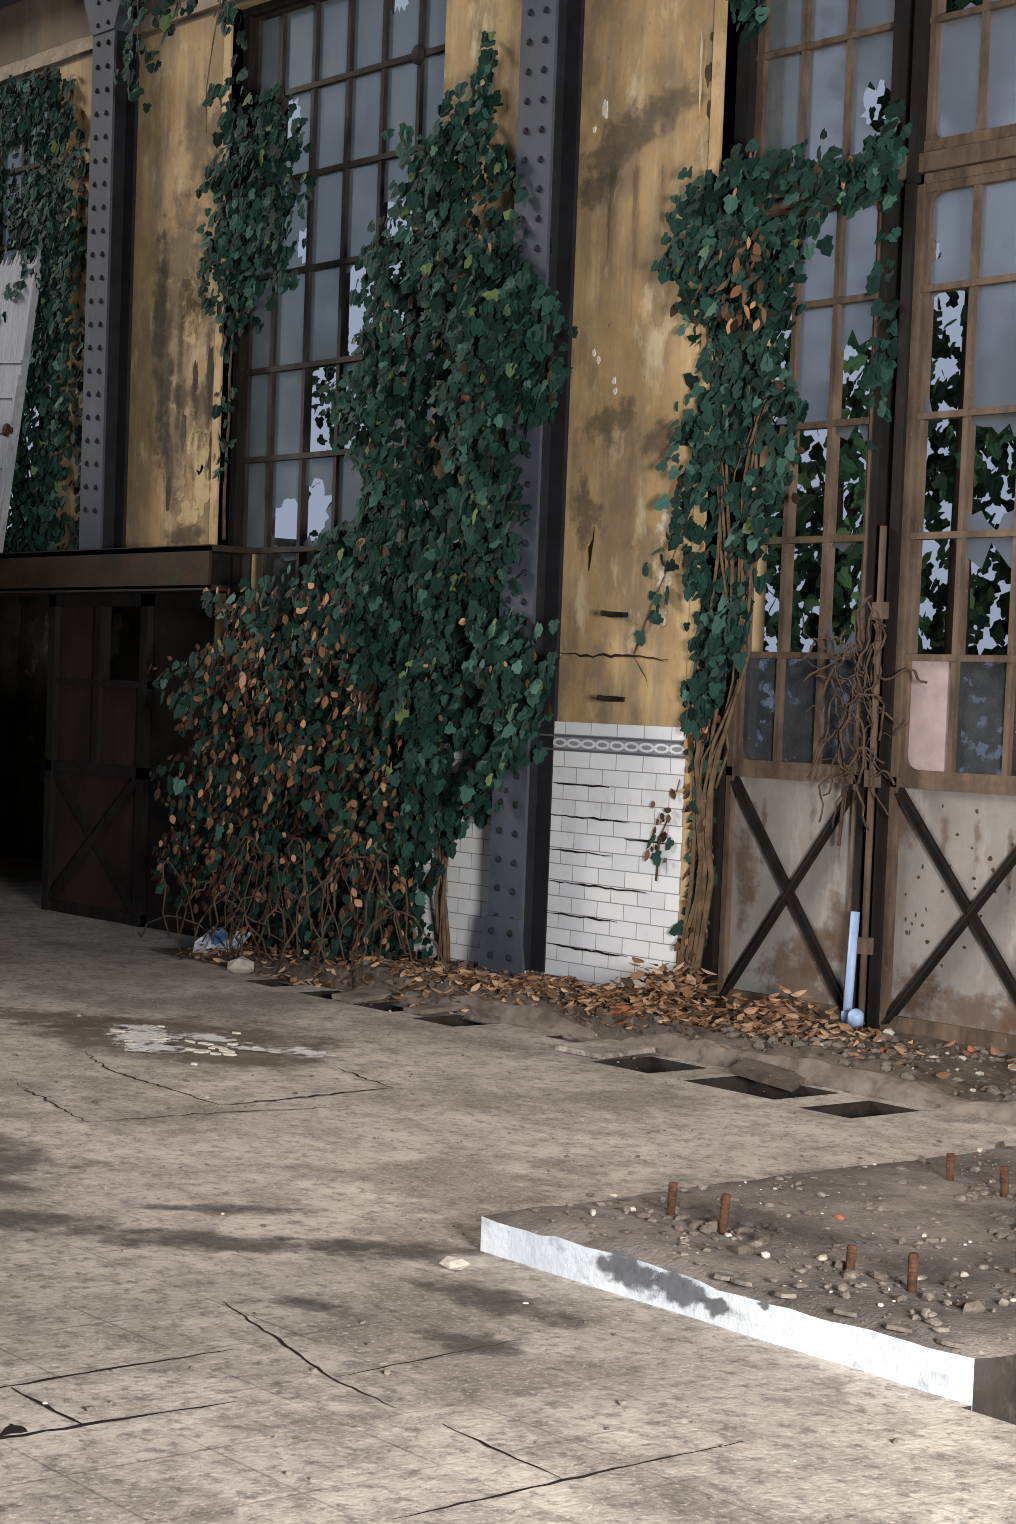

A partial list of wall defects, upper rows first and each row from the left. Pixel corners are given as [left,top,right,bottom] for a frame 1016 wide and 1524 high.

water stain [187,106,221,169]
water stain [581,90,703,210]
water stain [151,194,214,507]
water stain [0,1007,340,1066]
crack [0,1302,469,1439]
crack [393,1424,742,1519]